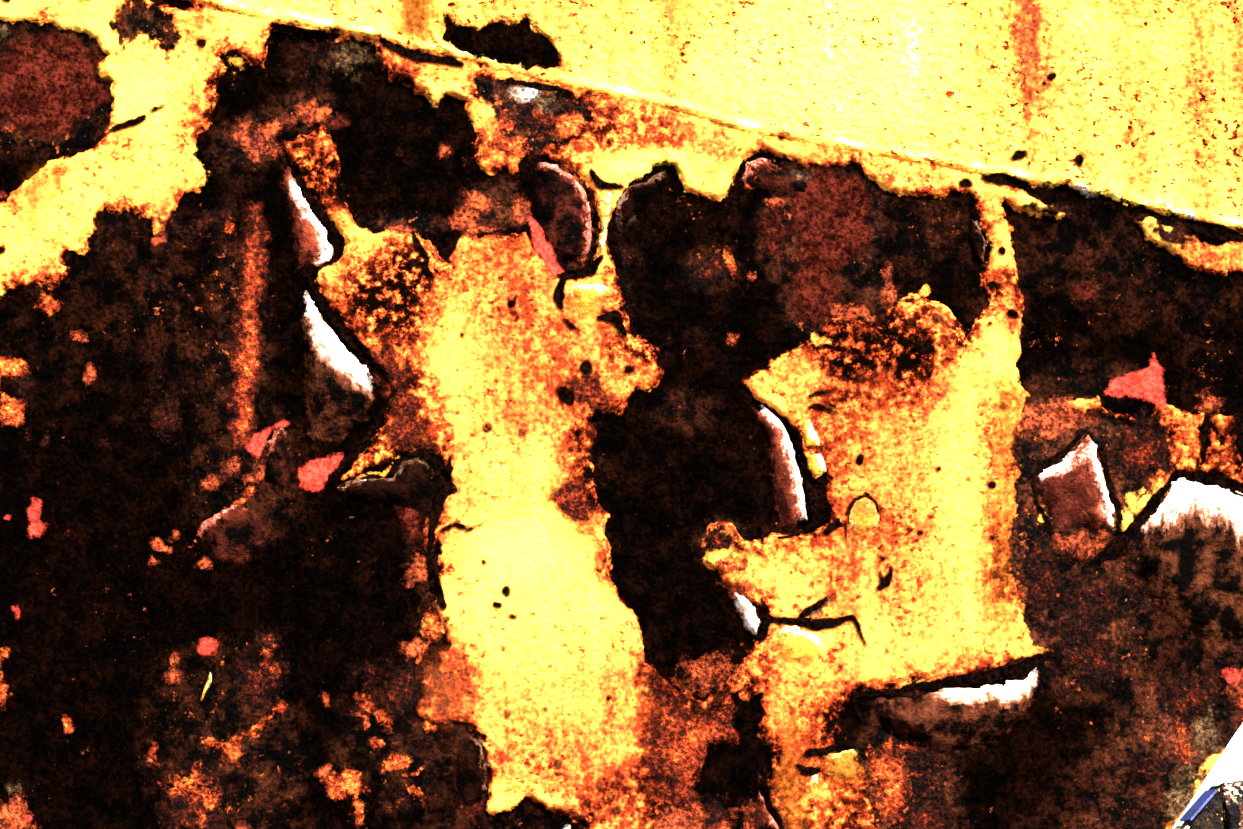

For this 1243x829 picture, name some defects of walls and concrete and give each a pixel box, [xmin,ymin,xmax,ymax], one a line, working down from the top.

peeling [443,15,562,70]
peeling [1011,149,1028,160]
rust [361,333,442,458]
peeling [0,29,1006,829]
rust [566,372,613,440]
rust [548,471,593,533]
peeling [828,180,1243,829]
rust [630,652,739,808]